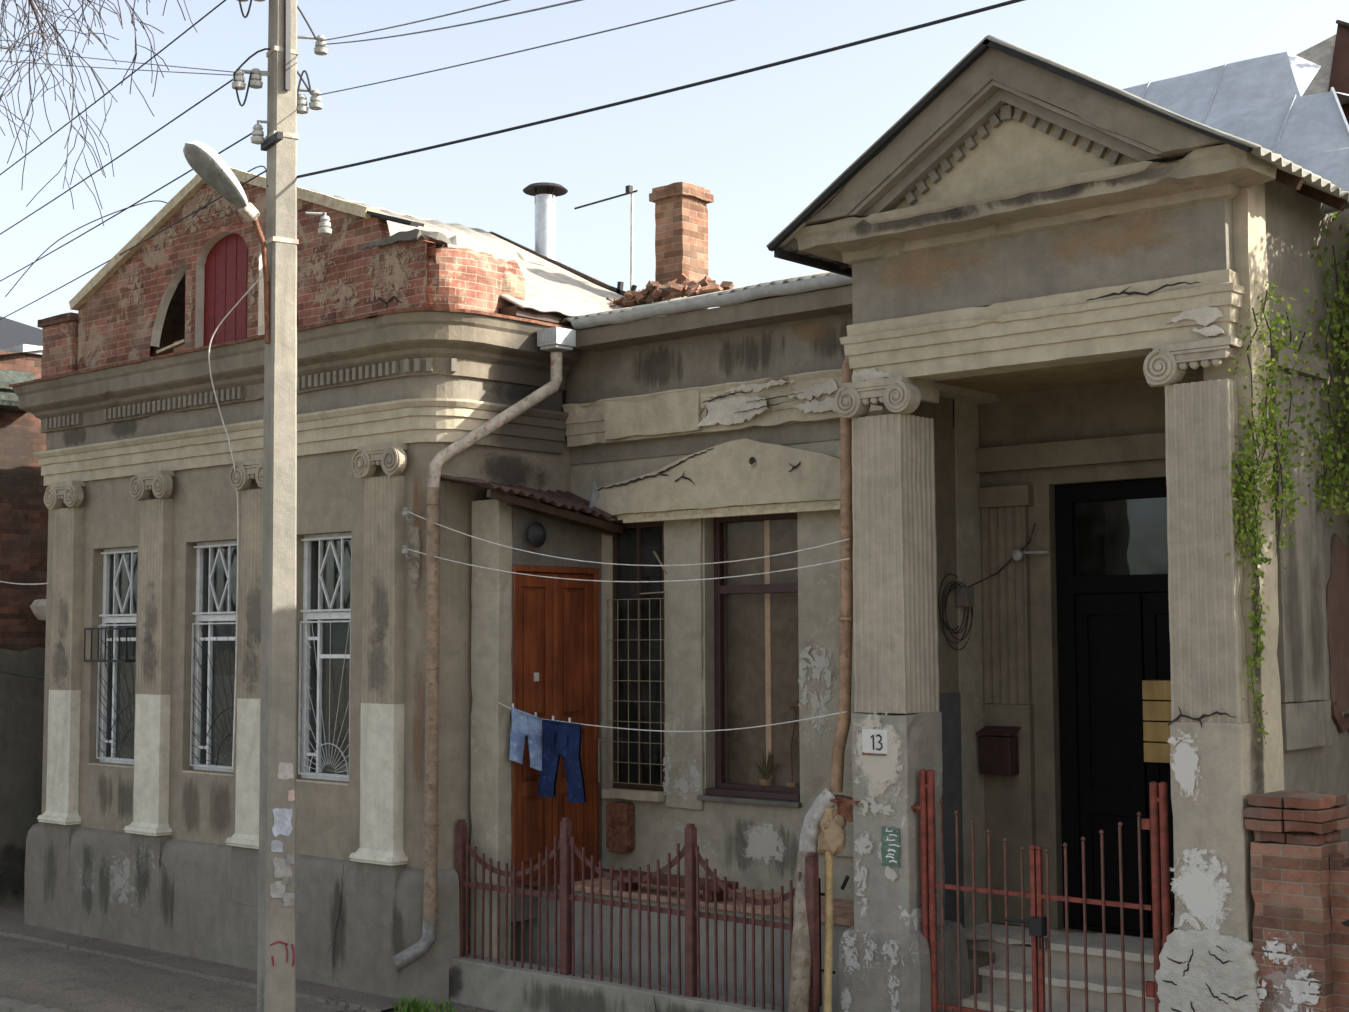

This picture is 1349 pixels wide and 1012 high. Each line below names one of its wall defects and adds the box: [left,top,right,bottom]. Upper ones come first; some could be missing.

peeling [297,242,417,313]
crack [1086,282,1200,301]
spalling [1166,307,1225,337]
spalling [697,368,894,427]
spalling [1326,534,1349,733]
peeling [798,645,834,735]
peeling [1168,731,1202,800]
peeling [852,712,902,904]
peeling [1170,848,1231,931]
water stain [449,967,460,996]
peeling [840,930,904,1012]
peeling [1256,932,1322,1012]